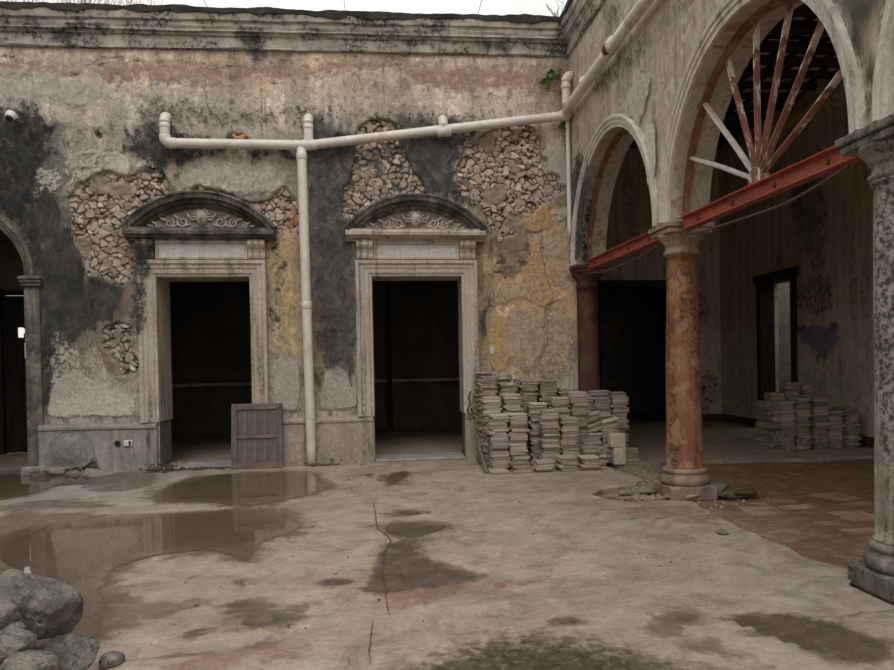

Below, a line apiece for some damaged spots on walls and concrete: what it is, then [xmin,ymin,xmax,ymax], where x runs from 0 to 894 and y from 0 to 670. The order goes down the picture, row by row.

damp [0,101,151,413]
peeling [0,53,250,105]
flaking render [33,126,299,380]
damp [121,98,479,386]
flaking render [342,120,425,219]
crack [326,502,488,670]